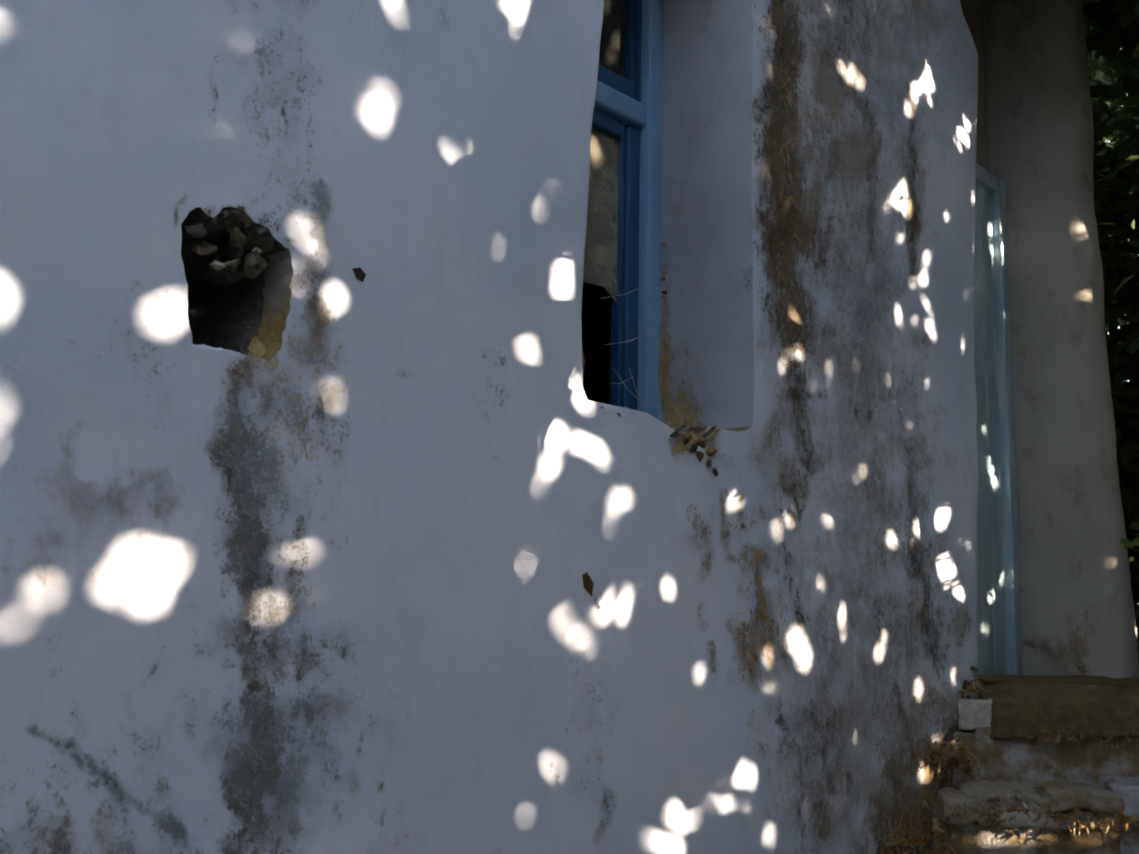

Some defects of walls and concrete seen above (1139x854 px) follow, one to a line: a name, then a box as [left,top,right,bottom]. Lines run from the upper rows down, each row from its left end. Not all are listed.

spalling [182,199,294,286]
flaking render [237,315,285,371]
peeling [659,265,714,456]
water stain [743,0,893,657]
water stain [904,86,924,282]
water stain [210,181,354,854]
water stain [687,490,765,574]
water stain [865,389,970,854]
water stain [23,785,73,854]
water stain [759,700,852,850]